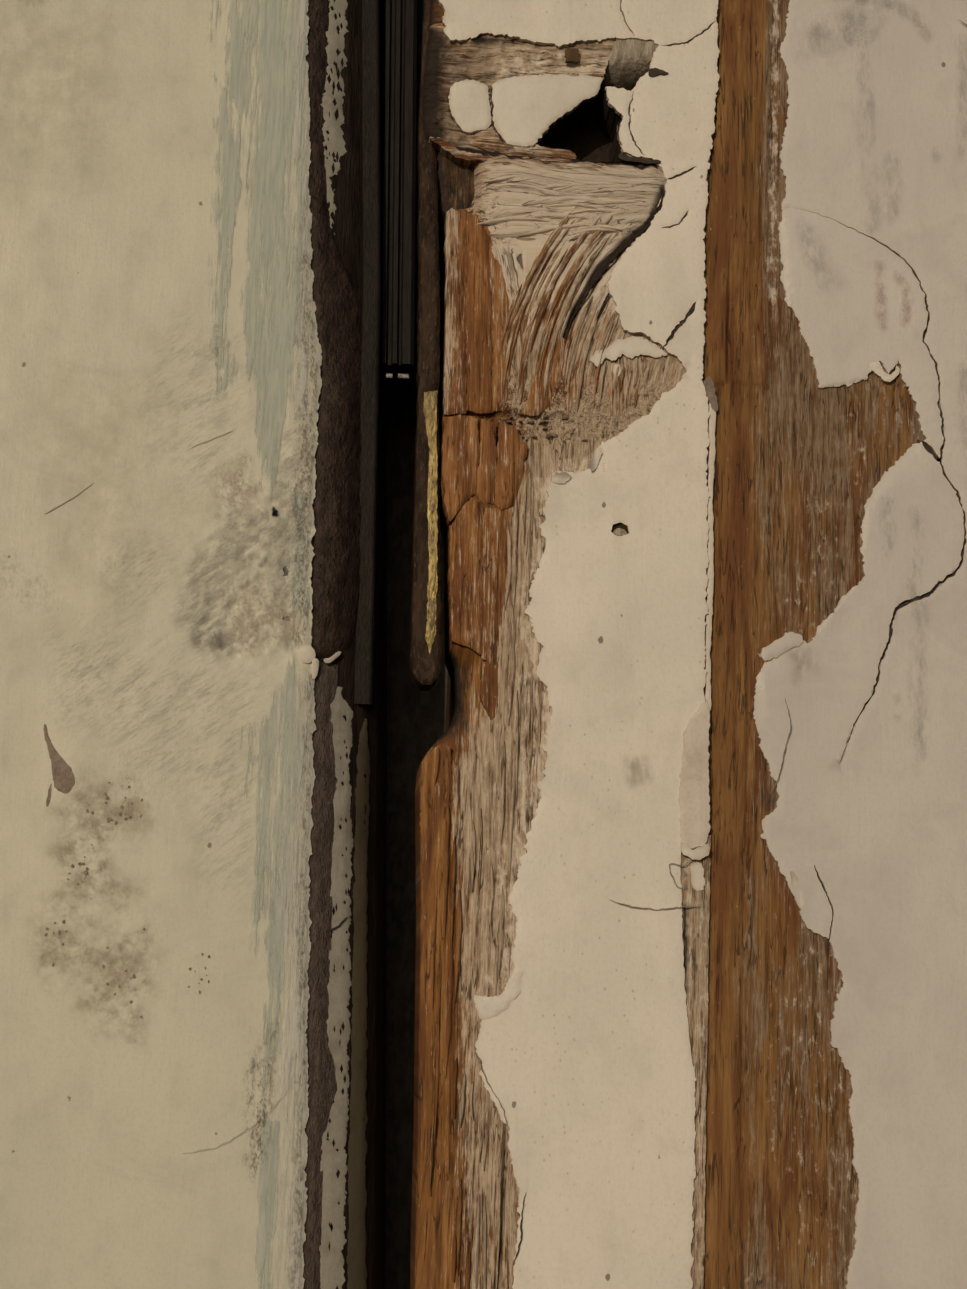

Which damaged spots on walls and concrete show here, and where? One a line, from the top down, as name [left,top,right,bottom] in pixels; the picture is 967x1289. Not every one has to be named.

peeling [448,79,491,135]
peeling [589,336,667,378]
crack [844,225,966,743]
peeling [678,0,925,1289]
crack [770,699,792,793]
leakage [86,782,143,826]
peeling [410,415,606,1289]